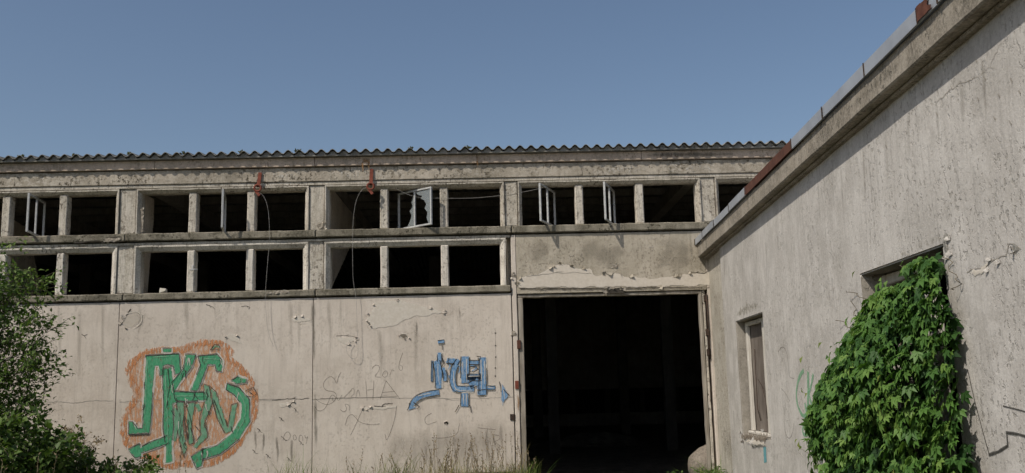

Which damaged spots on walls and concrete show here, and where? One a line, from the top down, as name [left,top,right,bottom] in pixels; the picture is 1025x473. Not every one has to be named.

crack [966,243,1020,275]
peeling [510,262,709,294]